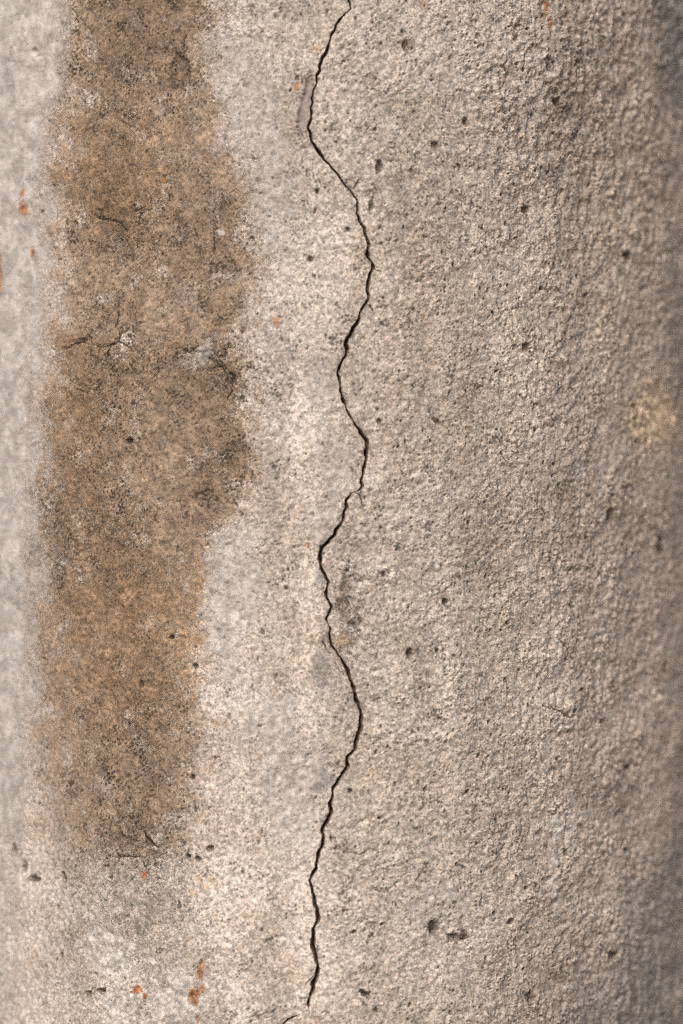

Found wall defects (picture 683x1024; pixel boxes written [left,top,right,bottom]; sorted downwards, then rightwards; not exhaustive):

leakage [0,0,293,875]
crack [282,0,381,1024]